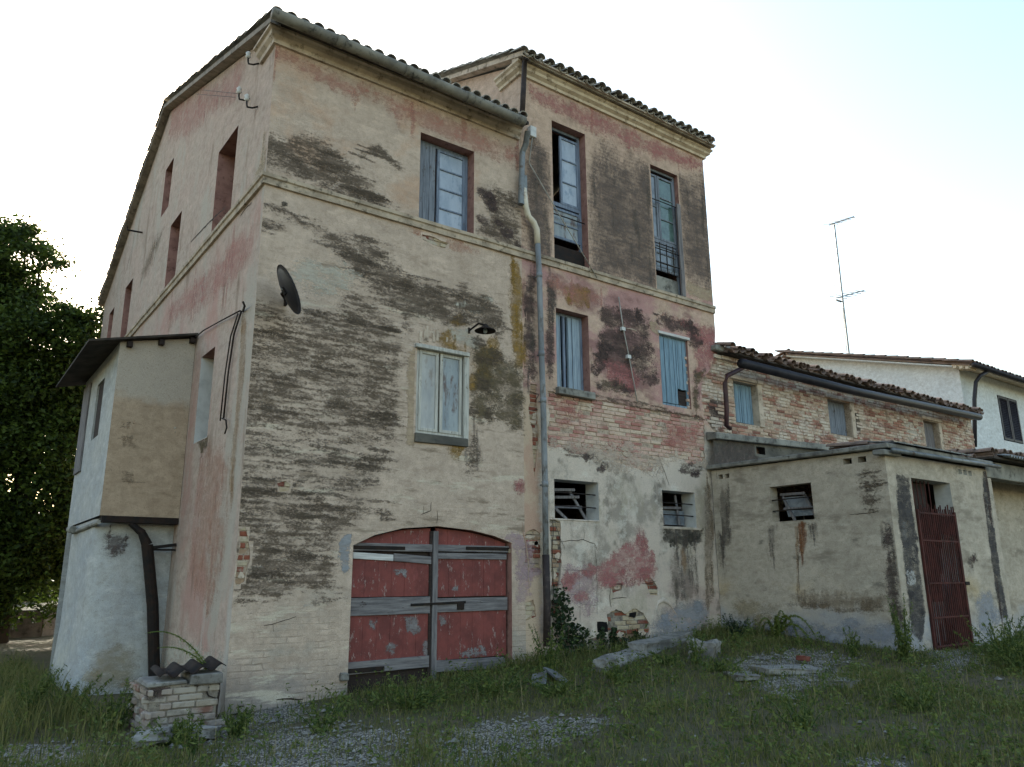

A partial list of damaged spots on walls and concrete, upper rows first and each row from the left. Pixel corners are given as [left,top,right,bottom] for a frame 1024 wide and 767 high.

water stain [234,132,556,604]
flaking render [515,384,708,485]
water stain [590,301,757,636]
water stain [104,525,128,557]
flaking render [235,527,261,586]
peeling [505,518,658,650]
corrosion [798,521,806,565]
water stain [759,470,926,647]
water stain [977,470,1008,637]